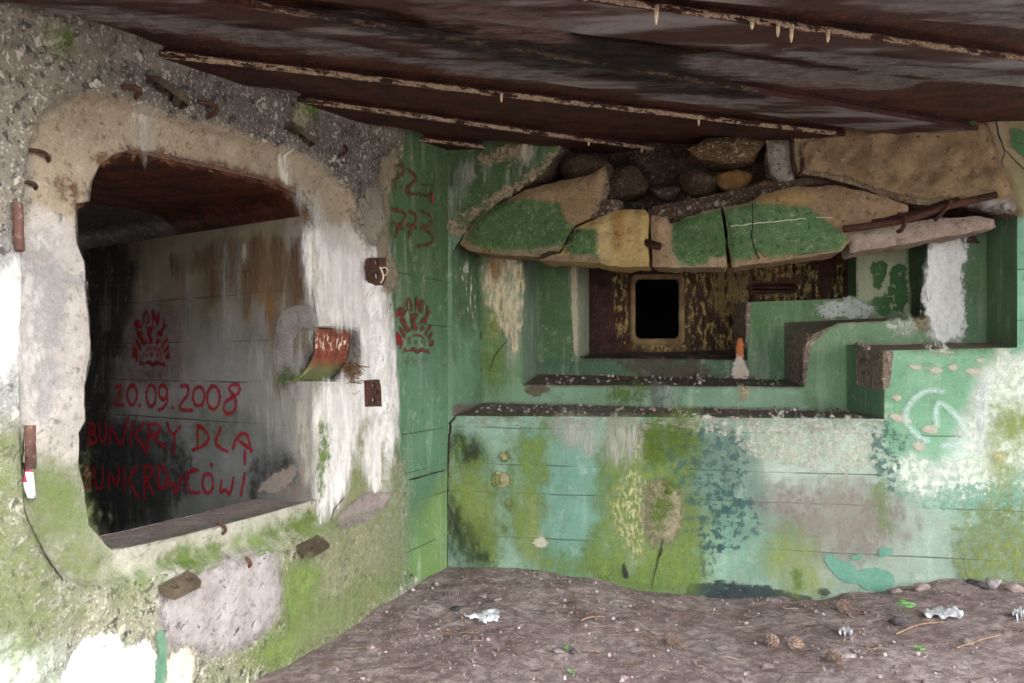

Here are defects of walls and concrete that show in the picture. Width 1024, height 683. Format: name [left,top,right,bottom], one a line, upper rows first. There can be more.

leakage [46,0,1024,136]
rust [56,178,80,207]
rust [97,146,314,227]
leakage [278,149,293,185]
crack [540,230,574,256]
crack [751,203,765,259]
rust [170,237,309,381]
leakage [91,326,125,361]
leakage [245,187,399,526]
leakage [87,417,192,528]
leakage [448,510,489,567]
crack [651,541,663,589]